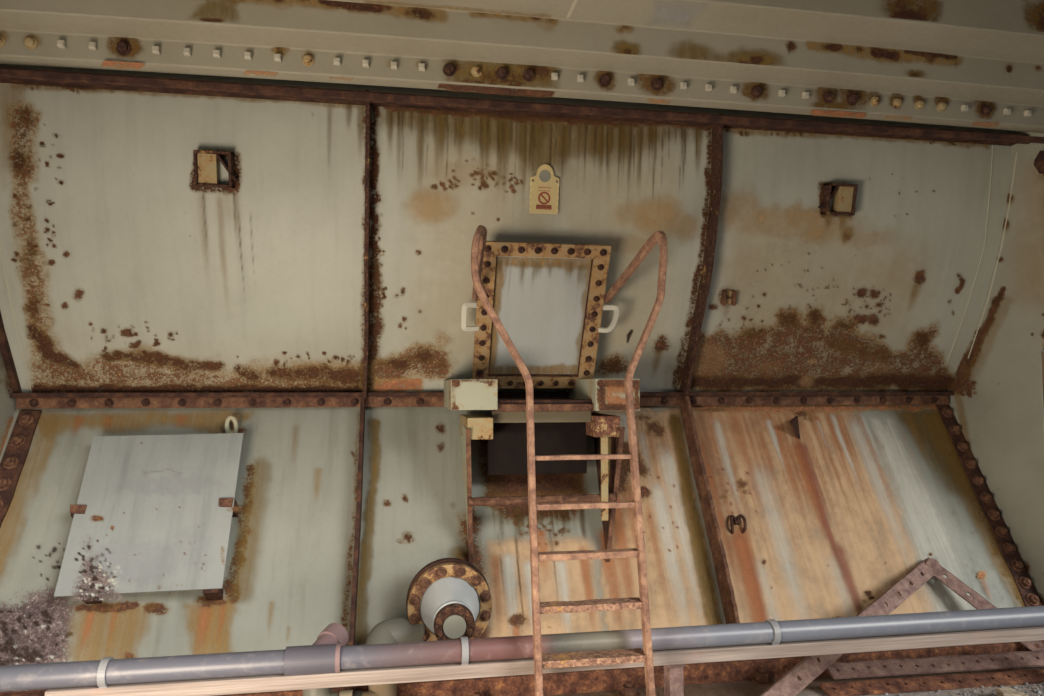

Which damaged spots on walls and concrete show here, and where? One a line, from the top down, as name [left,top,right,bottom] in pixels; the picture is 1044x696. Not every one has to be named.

corrosion [195,0,446,23]
corrosion [438,61,556,98]
corrosion [787,41,961,78]
leakage [392,111,700,168]
corrosion [431,161,523,193]
corrosion [6,101,495,410]
corrosion [654,126,1006,397]
corrosion [594,354,665,439]
corrosion [478,439,587,546]
corrosion [618,442,659,498]
corrosion [794,445,875,612]
corrosion [75,588,170,615]